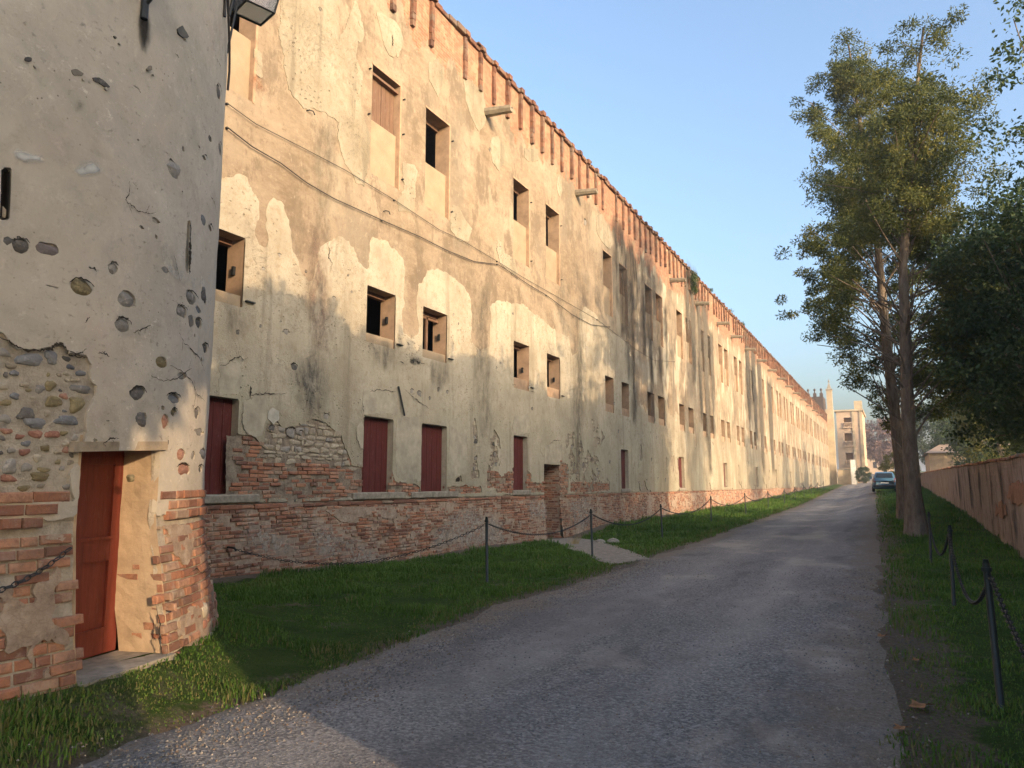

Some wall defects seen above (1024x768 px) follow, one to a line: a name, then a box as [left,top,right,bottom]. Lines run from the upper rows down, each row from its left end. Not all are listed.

spalling [0,350,91,492]
crack [152,343,248,407]
crack [242,386,286,435]
peeling [176,174,831,504]